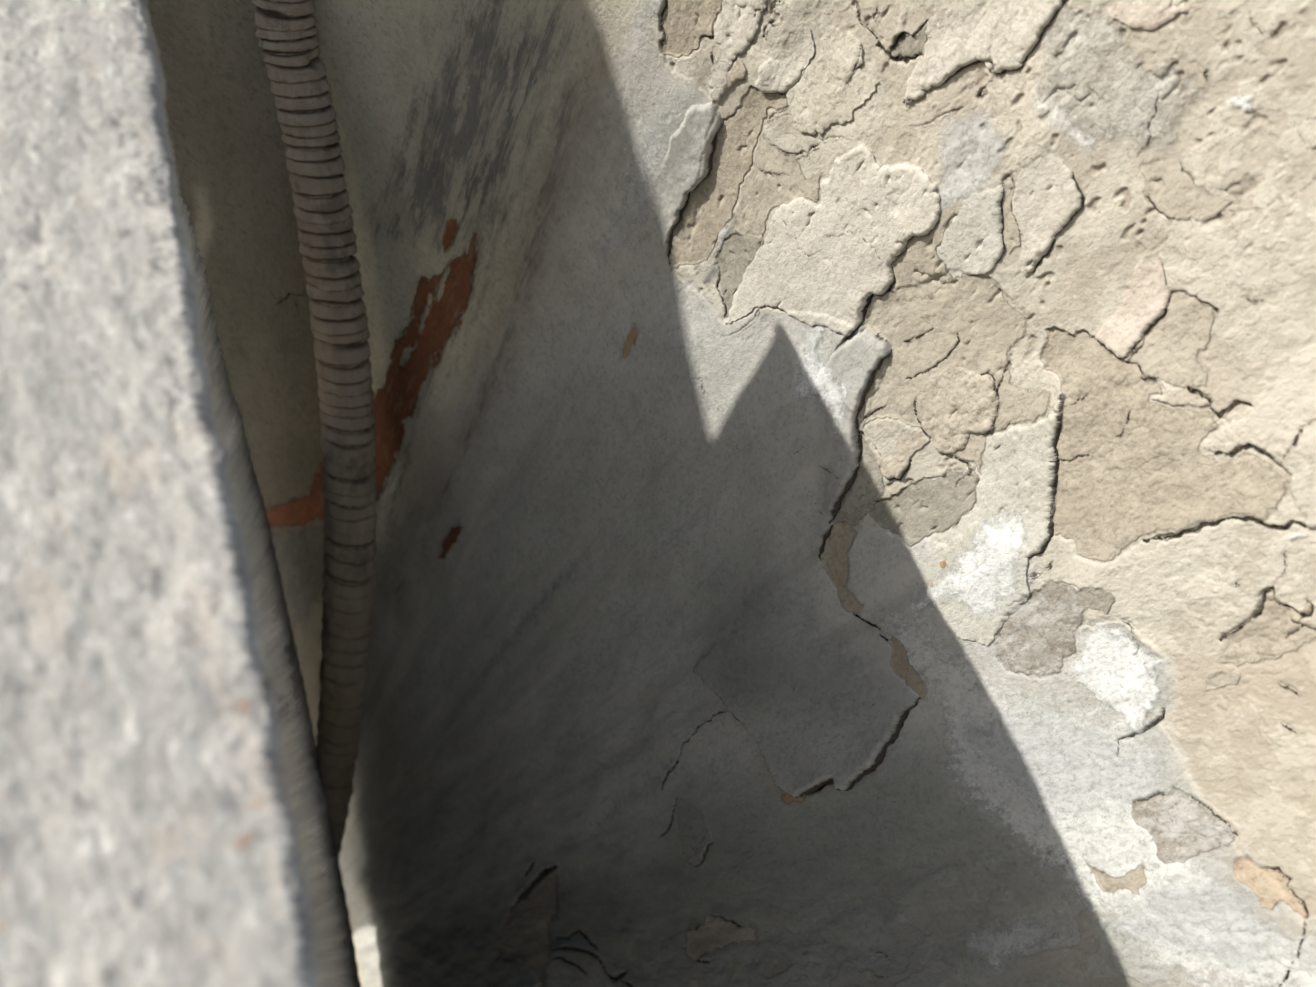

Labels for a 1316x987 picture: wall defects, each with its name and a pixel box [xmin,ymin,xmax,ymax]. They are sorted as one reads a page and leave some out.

damp [394,0,555,237]
rust [266,463,324,530]
rust [373,219,477,501]
rust [439,526,463,559]
crack [783,221,971,556]
spalling [660,0,1316,675]
crack [1027,393,1088,577]
crack [1143,516,1316,641]
spalling [1202,588,1316,691]
crack [1214,420,1316,474]
peeling [695,670,900,797]
spalling [1086,788,1235,895]